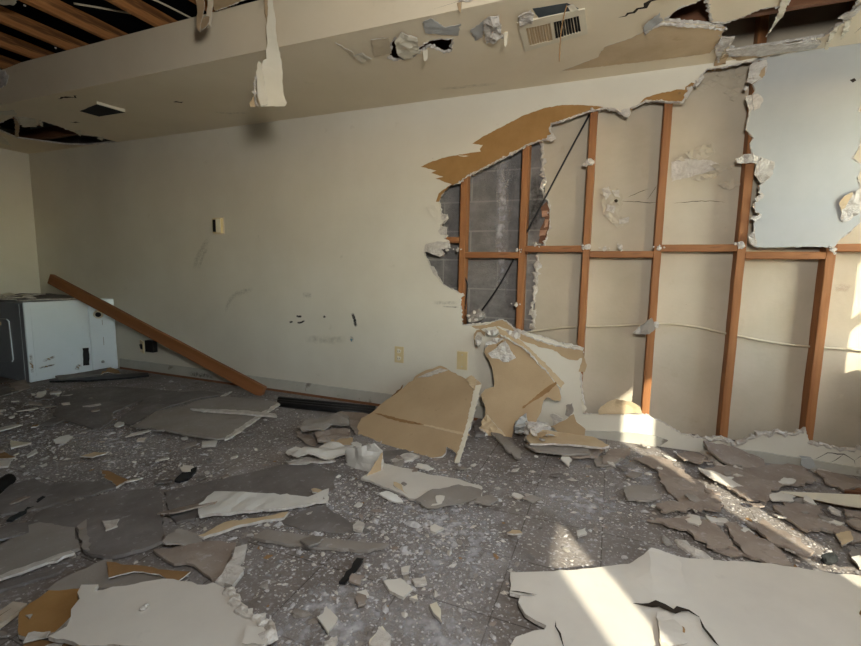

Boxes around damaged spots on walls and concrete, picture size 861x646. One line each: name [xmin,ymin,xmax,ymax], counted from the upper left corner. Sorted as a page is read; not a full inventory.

peeling [371,16,504,60]
peeling [13,117,43,137]
spalling [472,0,861,390]
spalling [424,181,492,326]
spalling [615,413,861,452]